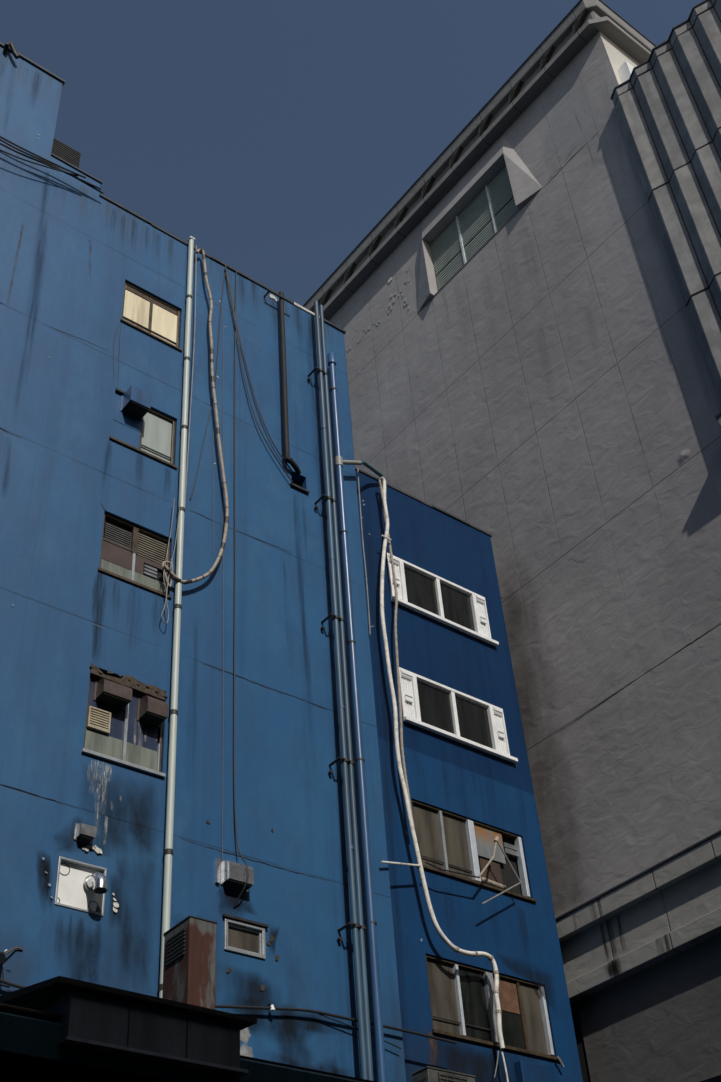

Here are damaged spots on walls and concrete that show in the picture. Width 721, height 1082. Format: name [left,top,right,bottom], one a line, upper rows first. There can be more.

flaking render [240,1028,252,1057]